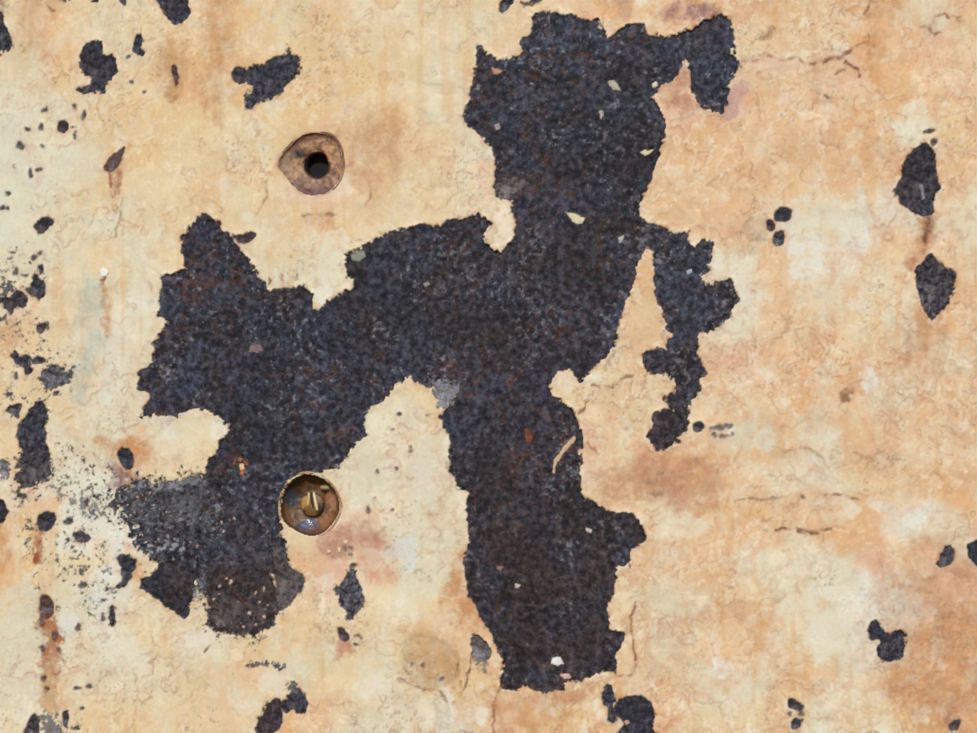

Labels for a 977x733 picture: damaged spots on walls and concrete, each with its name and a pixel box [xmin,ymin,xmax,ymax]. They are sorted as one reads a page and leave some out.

rust [724,85,746,120]
peeling [894,130,941,216]
peeling [914,253,956,320]
peeling [0,0,739,693]
peeling [936,545,954,568]
peeling [967,540,977,565]
rust [37,595,64,712]
peeling [868,620,906,662]
peeling [24,710,80,733]
peeling [255,681,308,733]
peeling [602,684,655,733]